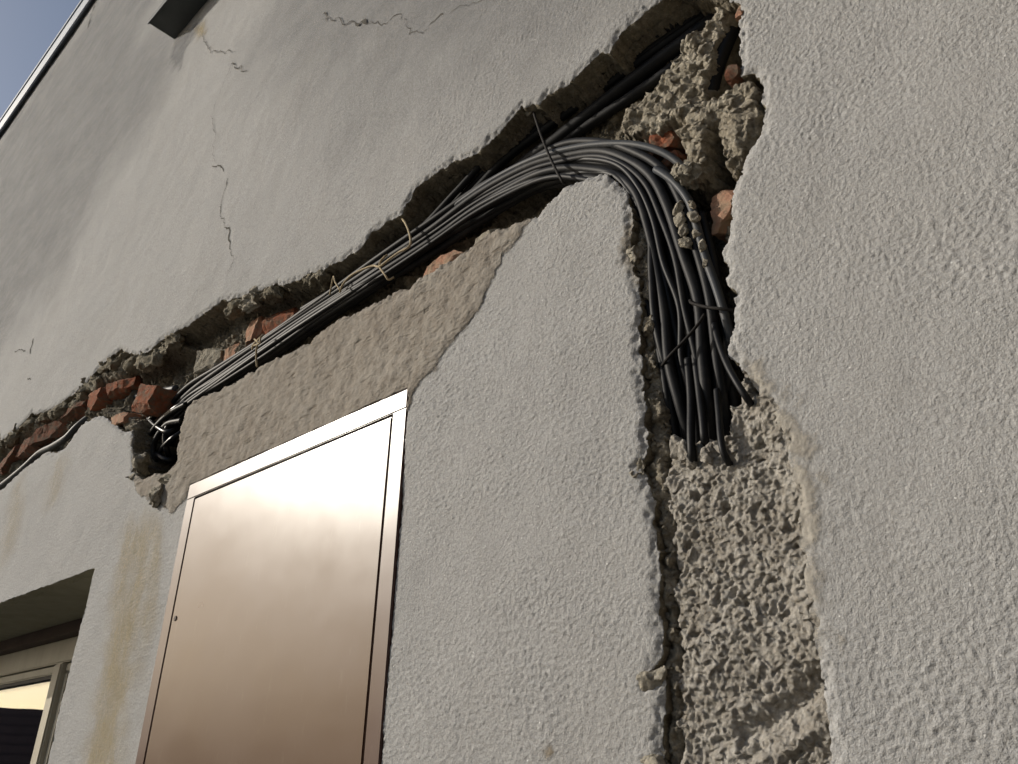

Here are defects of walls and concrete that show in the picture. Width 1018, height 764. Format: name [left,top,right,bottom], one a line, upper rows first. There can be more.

crack [203,36,247,265]
spalling [0,0,766,513]
crack [323,0,497,34]
spalling [629,314,729,764]